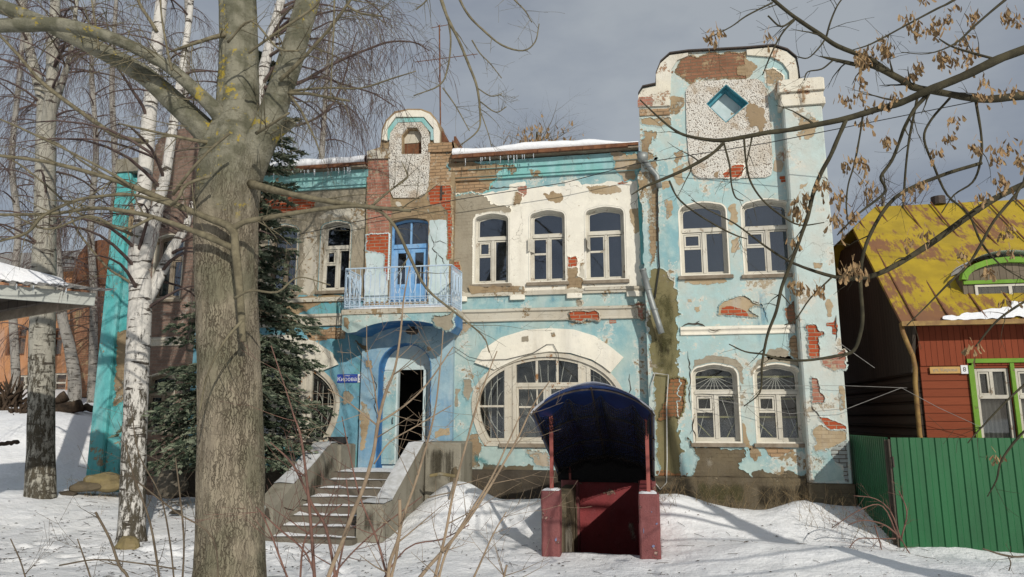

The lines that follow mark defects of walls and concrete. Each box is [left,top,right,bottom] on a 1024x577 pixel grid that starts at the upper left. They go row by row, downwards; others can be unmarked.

flaking render [671,51,785,87]
peeling [258,159,402,315]
peeling [427,153,527,294]
peeling [543,191,563,203]
spalling [431,310,473,336]
flaking render [565,255,616,327]
peeling [586,96,849,482]
peeling [447,432,550,483]